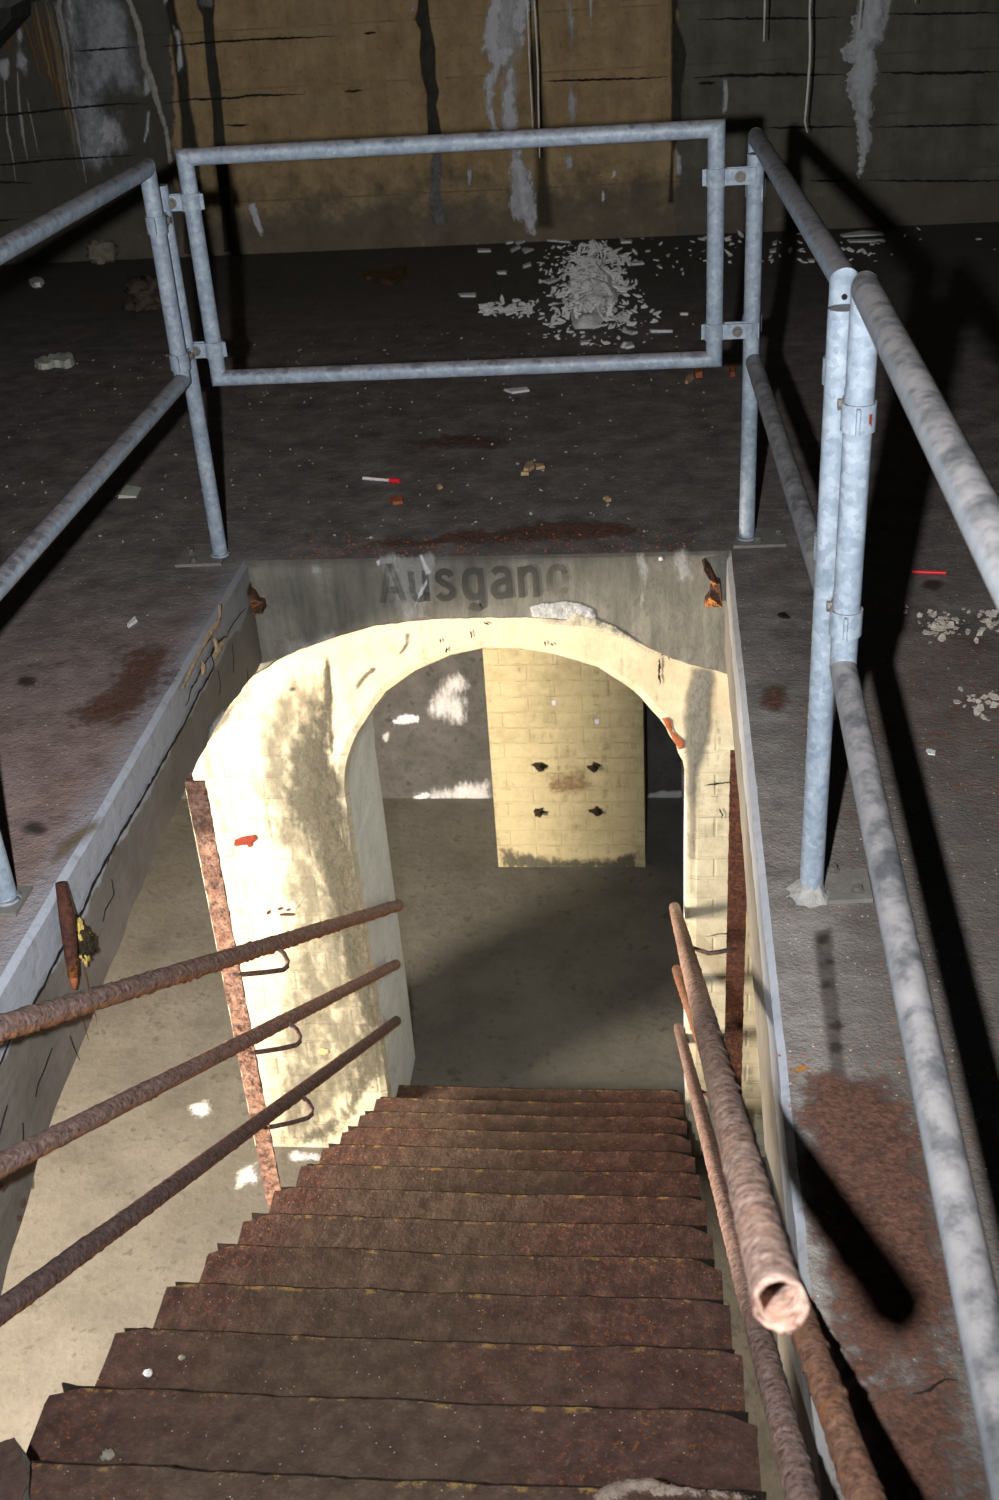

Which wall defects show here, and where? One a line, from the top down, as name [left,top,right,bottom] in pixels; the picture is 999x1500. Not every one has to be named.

water stain [67,0,225,166]
water stain [411,0,441,135]
water stain [481,0,544,131]
water stain [840,0,890,178]
water stain [195,164,263,252]
water stain [508,147,551,235]
corrosion [70,648,172,725]
spalling [530,601,654,654]
water stain [265,660,388,1161]
water stain [190,1103,209,1116]
water stain [237,1165,257,1188]
corrosion [794,1066,983,1500]